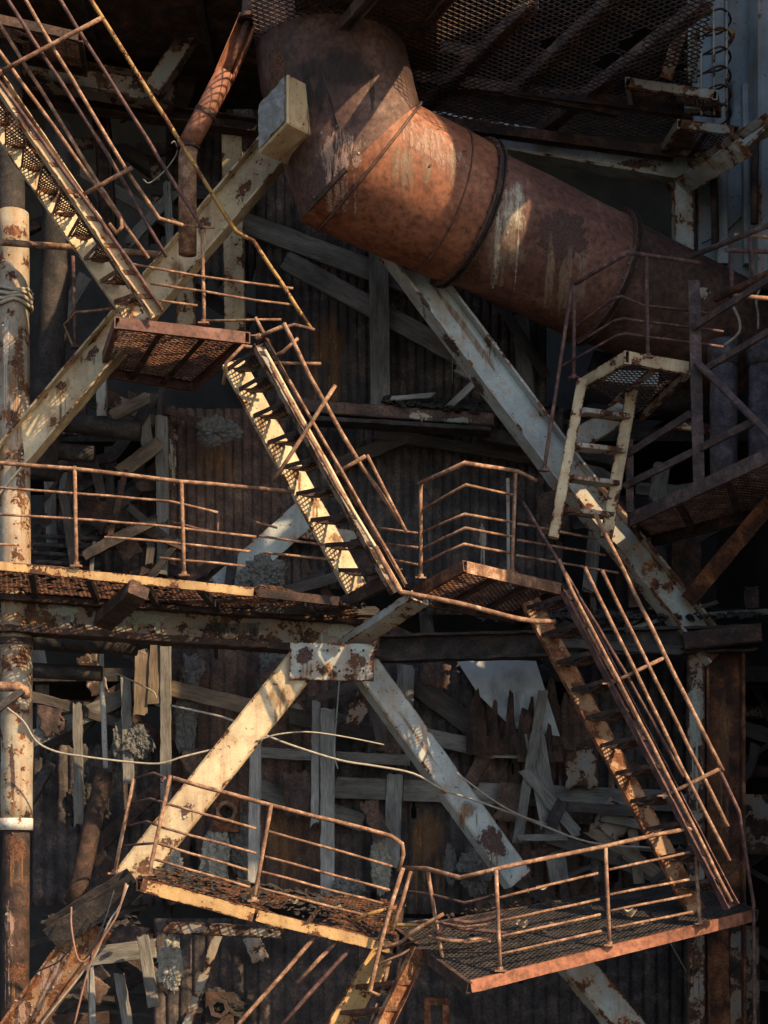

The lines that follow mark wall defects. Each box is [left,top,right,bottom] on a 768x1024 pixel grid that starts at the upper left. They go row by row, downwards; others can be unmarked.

corrosion [532,210,591,309]
corrosion [436,288,497,369]
corrosion [346,649,369,679]